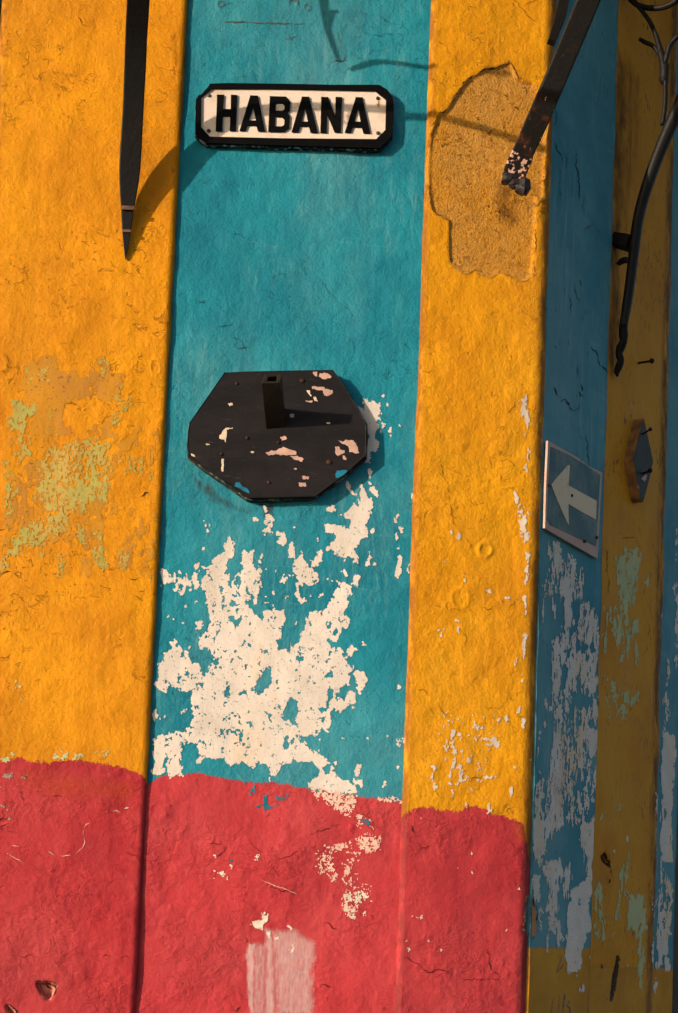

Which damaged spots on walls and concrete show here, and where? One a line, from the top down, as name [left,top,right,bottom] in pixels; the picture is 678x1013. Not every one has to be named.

spalling [425,60,550,282]
crack [554,340,608,411]
peeling [518,395,530,435]
peeling [0,354,401,797]
peeling [393,513,410,579]
peeling [513,491,531,615]
peeling [249,785,288,811]
peeling [430,706,526,797]
peeling [517,540,678,994]
peeling [250,912,278,940]
peeling [343,890,369,919]